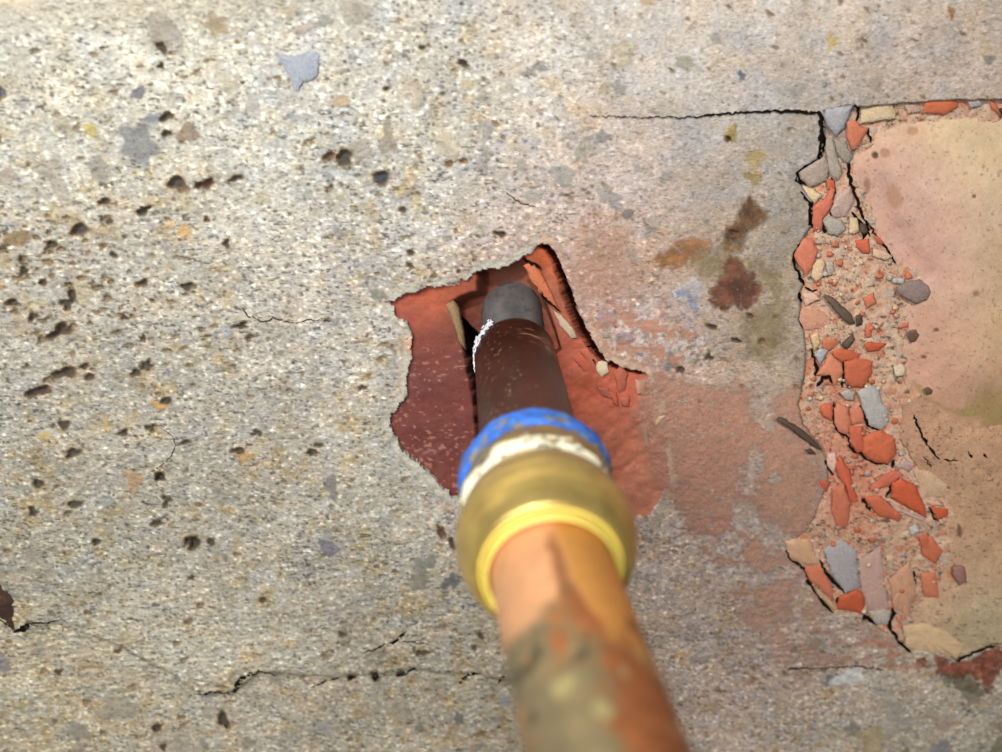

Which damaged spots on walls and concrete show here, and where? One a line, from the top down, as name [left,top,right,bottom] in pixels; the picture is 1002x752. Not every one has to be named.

spalling [386,286,417,322]
spalling [464,236,678,483]
spalling [781,100,1002,659]
spalling [382,349,460,509]
rust [0,585,15,631]
crack [0,620,59,633]
crack [189,669,276,696]
crack [312,631,427,687]
crack [459,672,505,684]